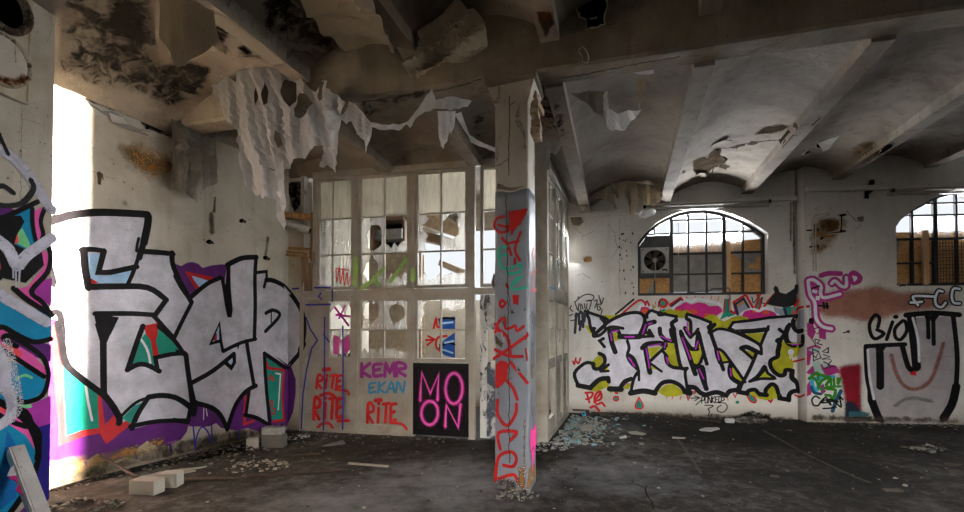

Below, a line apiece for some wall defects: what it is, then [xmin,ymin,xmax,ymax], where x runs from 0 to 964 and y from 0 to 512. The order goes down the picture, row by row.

leakage [61,0,210,105]
corrosion [0,74,30,85]
leakage [141,122,172,138]
peeling [83,0,495,230]
flaking render [530,91,544,143]
peeling [570,70,654,131]
peeling [570,181,663,232]